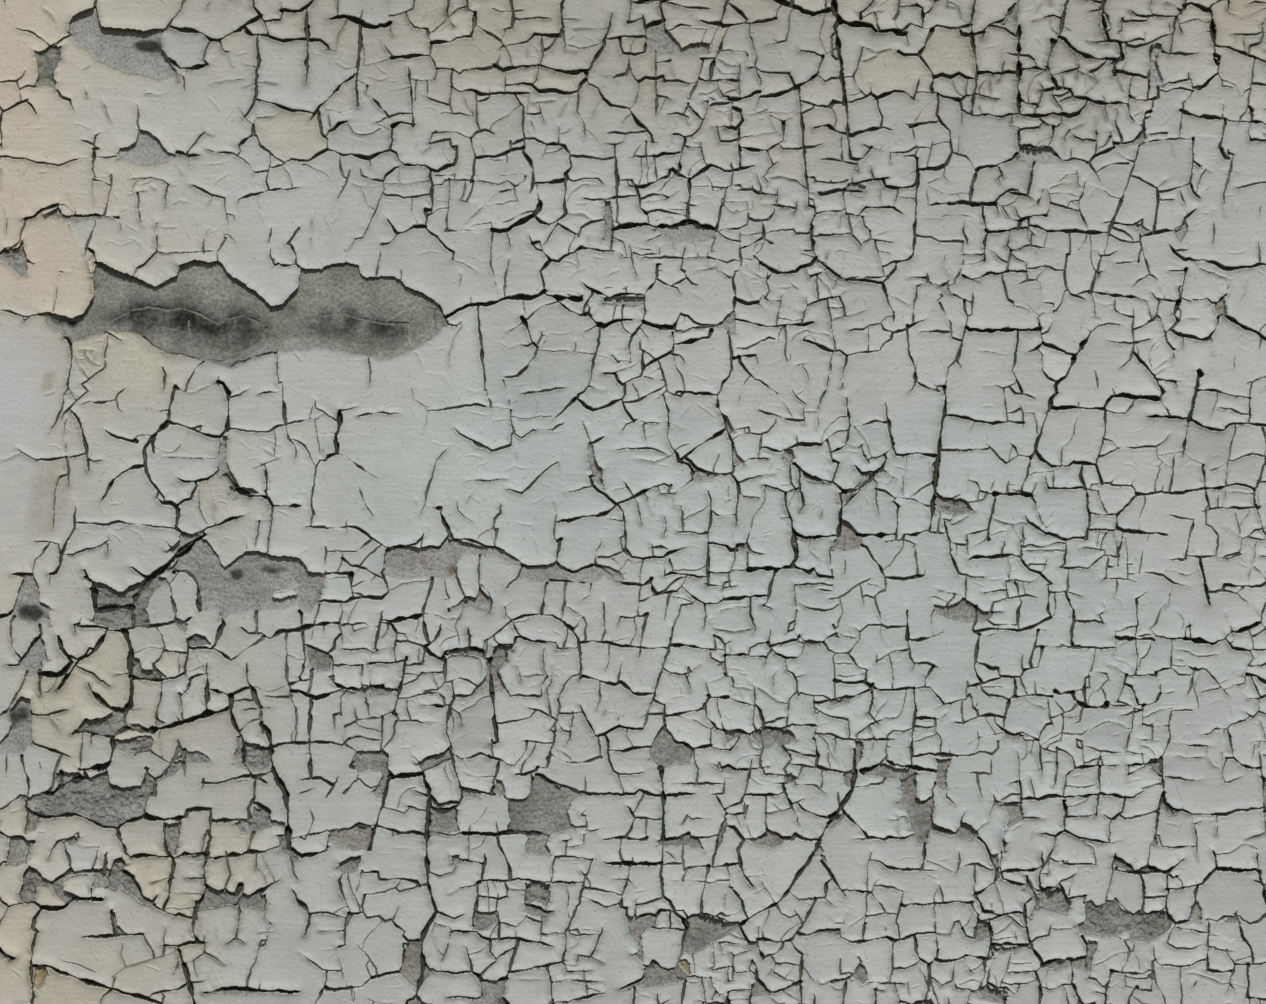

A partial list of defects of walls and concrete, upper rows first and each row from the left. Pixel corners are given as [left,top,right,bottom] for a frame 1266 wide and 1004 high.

peeling [34,8,179,89]
crack [0,71,123,264]
crack [1169,242,1266,278]
peeling [41,254,446,367]
crack [9,331,125,527]
crack [12,506,134,583]
peeling [91,532,326,629]
crack [48,832,109,884]
peeling [7,751,211,906]
peeling [431,776,585,854]
crack [204,918,300,994]
peeling [1025,880,1173,973]